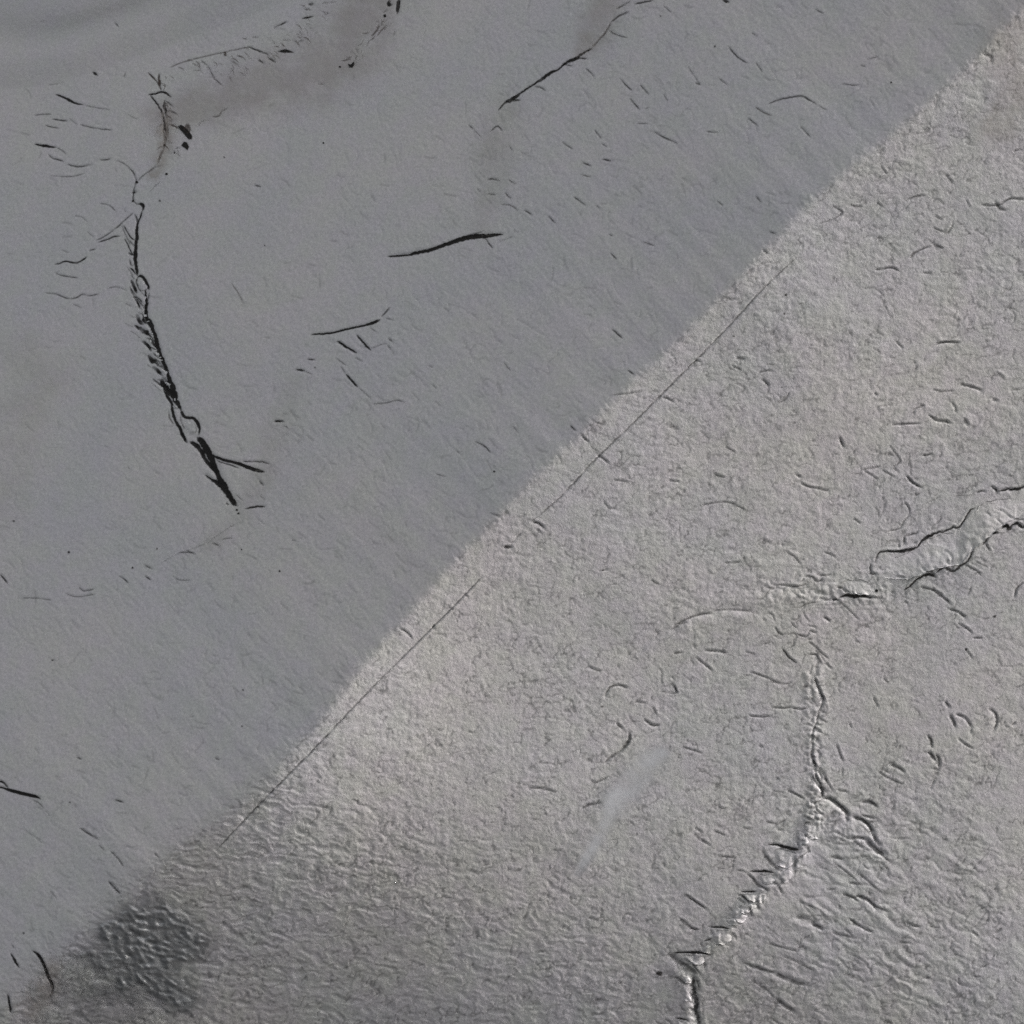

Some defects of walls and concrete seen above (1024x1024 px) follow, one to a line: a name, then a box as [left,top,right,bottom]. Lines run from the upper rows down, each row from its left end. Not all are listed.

crack [494,0,661,128]
crack [36,94,81,167]
crack [149,73,192,175]
crack [389,233,502,257]
crack [57,170,265,514]
crack [296,311,387,387]
crack [833,486,1024,616]
crack [794,763,874,831]
crack [656,830,818,1024]